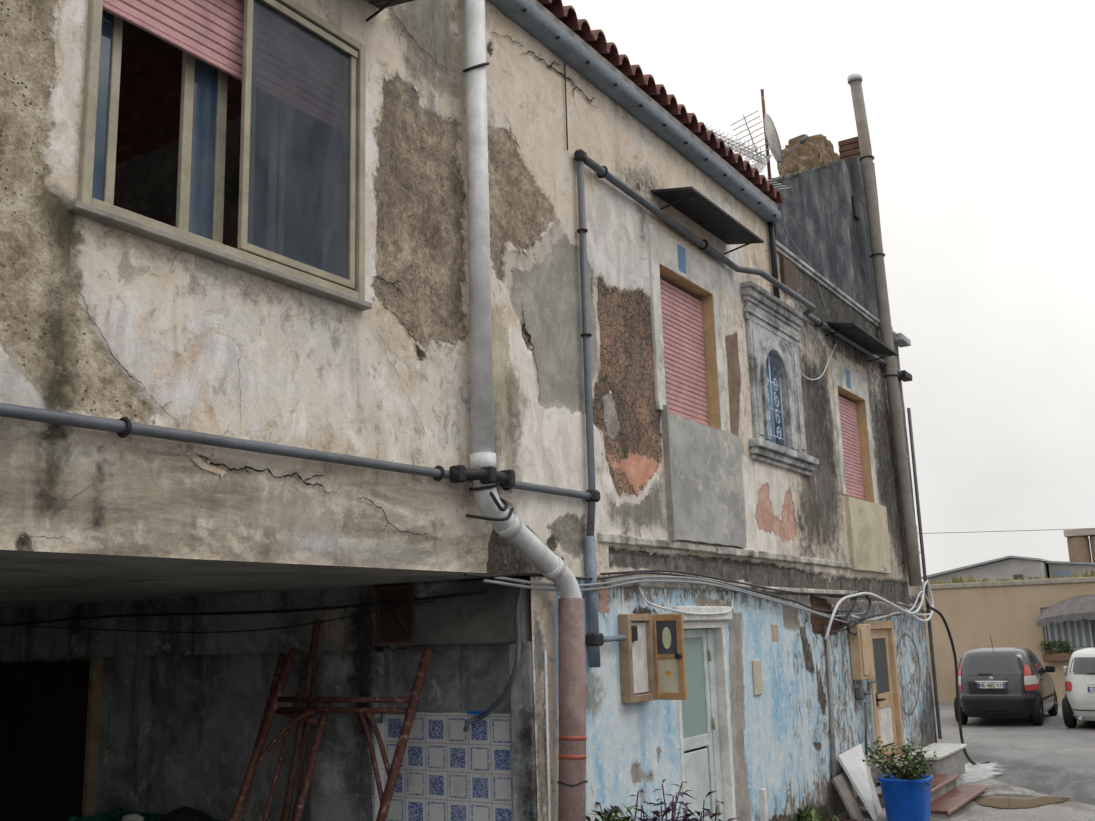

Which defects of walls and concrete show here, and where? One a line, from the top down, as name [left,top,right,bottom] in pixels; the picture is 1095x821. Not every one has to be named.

crack [493,15,597,108]
damp [42,193,80,277]
spalling [371,70,468,360]
spalling [488,126,559,282]
damp [0,301,67,411]
crack [77,287,180,429]
crack [368,276,437,459]
crack [522,302,540,392]
spalling [593,274,663,498]
crack [198,455,436,541]
flaking render [694,592,752,821]
flaking render [771,594,847,716]